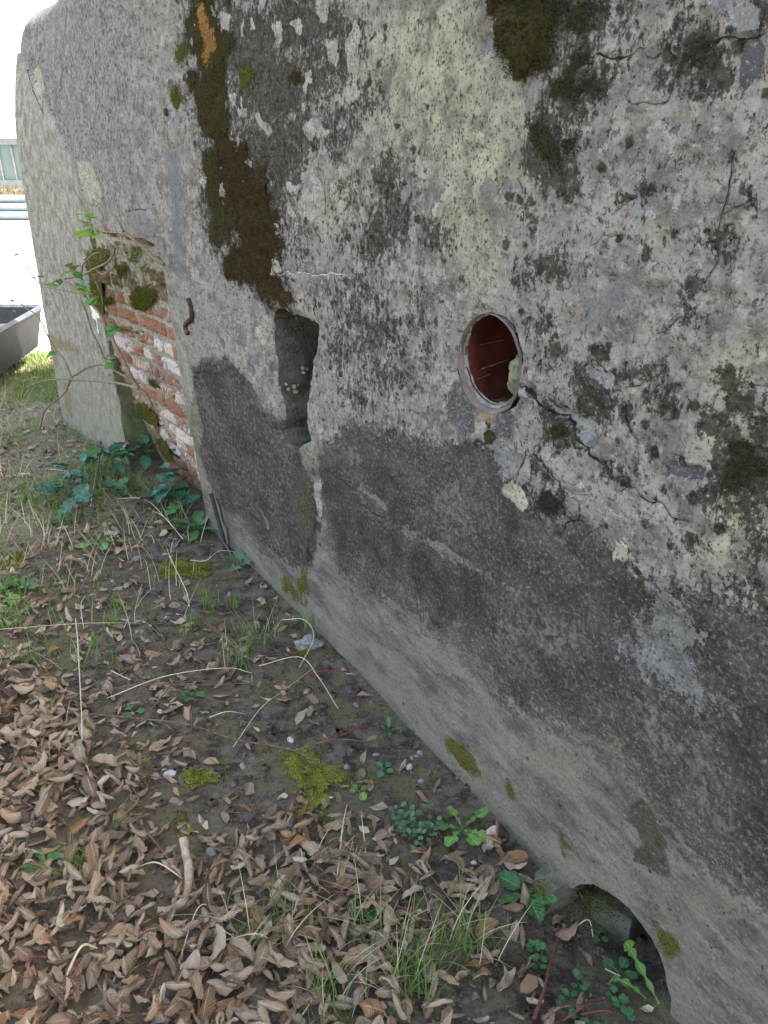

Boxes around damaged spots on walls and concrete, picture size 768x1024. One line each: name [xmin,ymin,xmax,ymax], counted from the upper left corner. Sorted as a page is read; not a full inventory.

crack [515,449,604,543]
crack [520,376,688,522]
leakage [191,353,768,927]